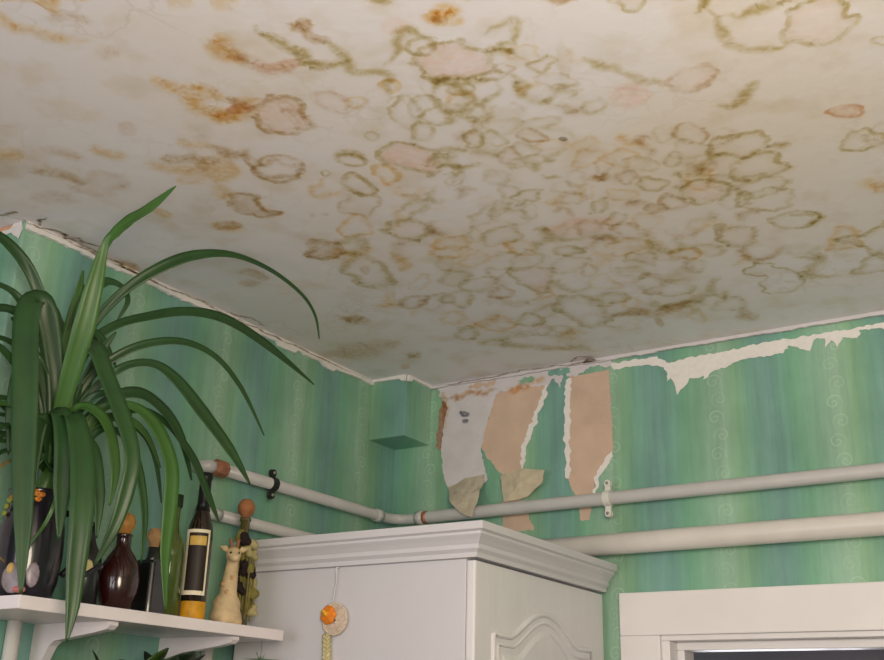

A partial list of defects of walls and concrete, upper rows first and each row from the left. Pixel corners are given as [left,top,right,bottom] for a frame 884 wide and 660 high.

flaking render [481,384,549,475]
flaking render [568,370,613,495]
flaking render [502,513,534,532]
flaking render [579,507,592,521]